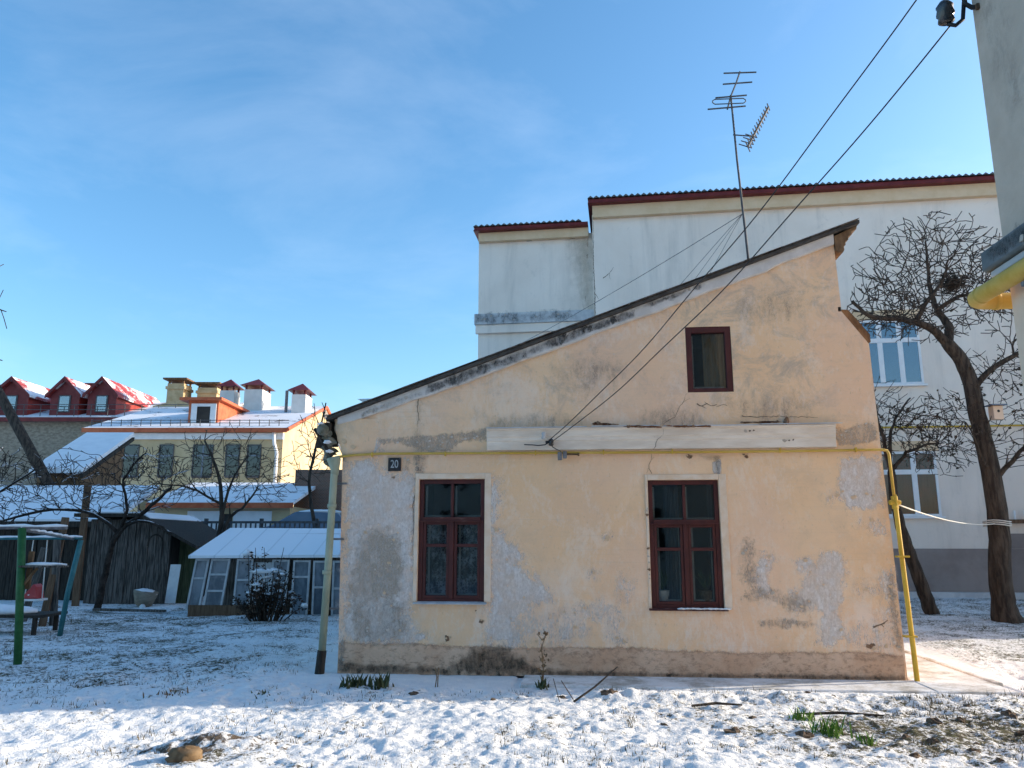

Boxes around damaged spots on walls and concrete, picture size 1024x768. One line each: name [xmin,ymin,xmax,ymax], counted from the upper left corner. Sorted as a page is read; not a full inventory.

crack [649,399,818,473]
peeling [829,422,886,535]
water stain [341,648,568,676]